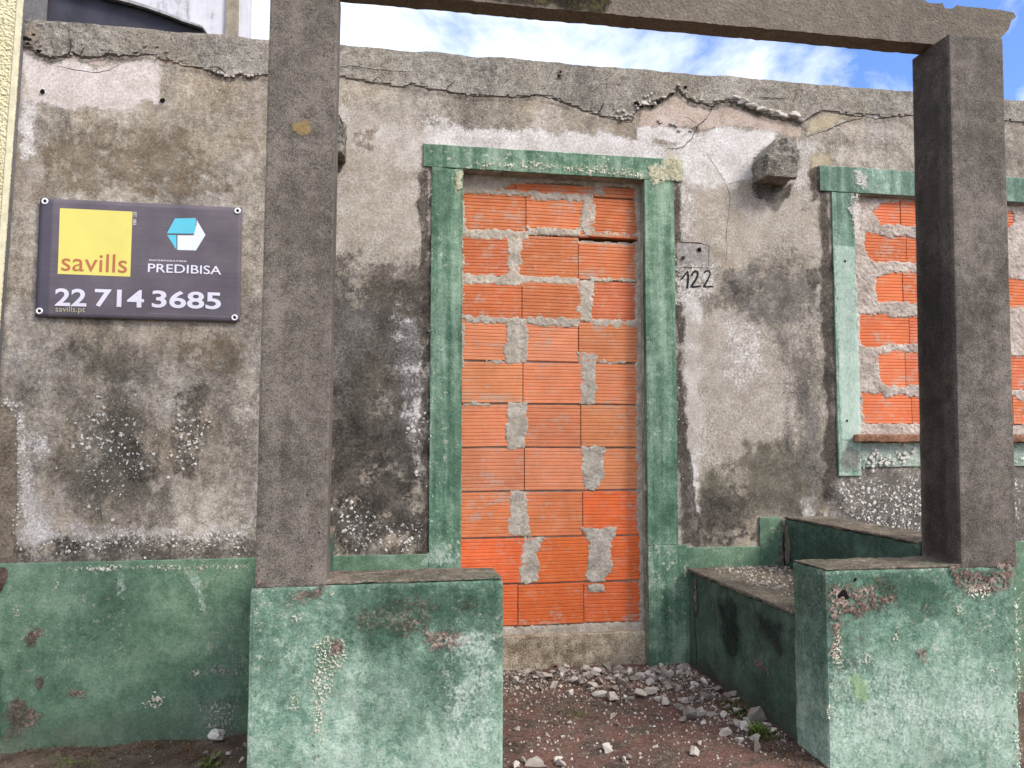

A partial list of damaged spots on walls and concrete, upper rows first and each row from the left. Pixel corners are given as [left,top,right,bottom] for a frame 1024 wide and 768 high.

crack [23,40,268,79]
water stain [40,123,242,205]
crack [341,65,905,259]
flaking render [479,96,802,185]
water stain [172,325,245,373]
water stain [330,102,922,555]
water stain [6,335,256,607]
peeling [358,598,471,650]
peeling [826,578,898,689]
peeling [950,558,1022,768]